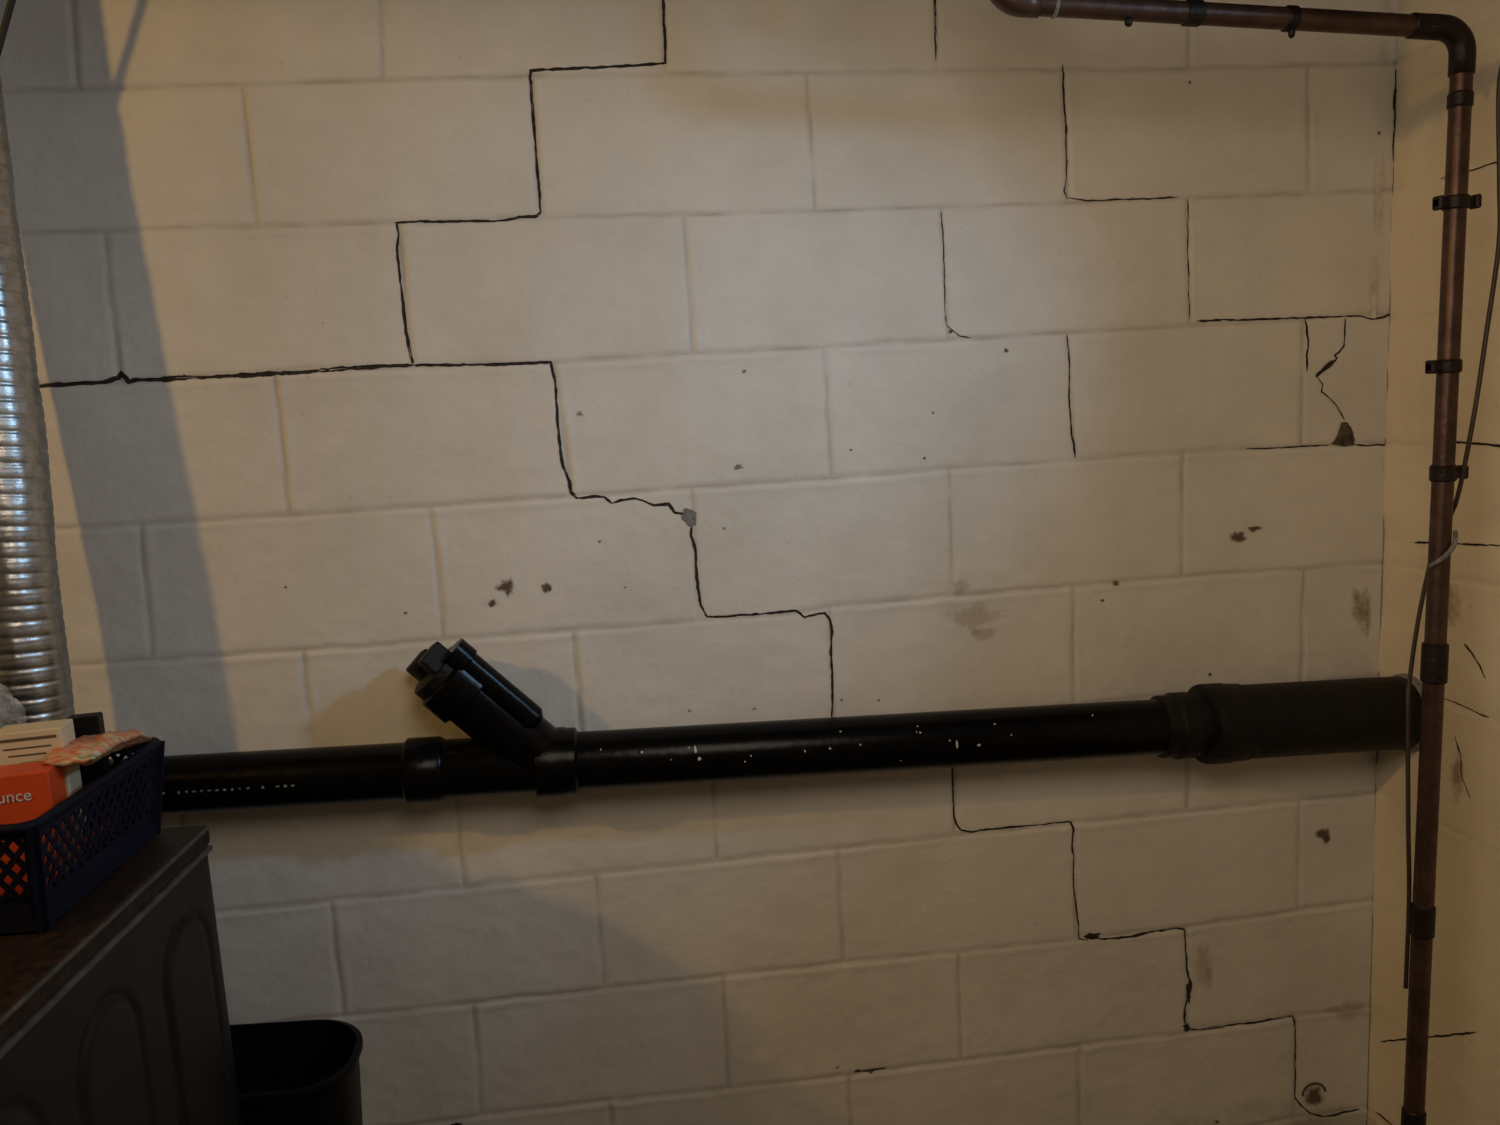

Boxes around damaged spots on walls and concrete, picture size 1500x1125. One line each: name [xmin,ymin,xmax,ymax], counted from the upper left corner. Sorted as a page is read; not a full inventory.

crack [40,0,834,717]
crack [1062,65,1390,456]
crack [952,768,1392,1125]